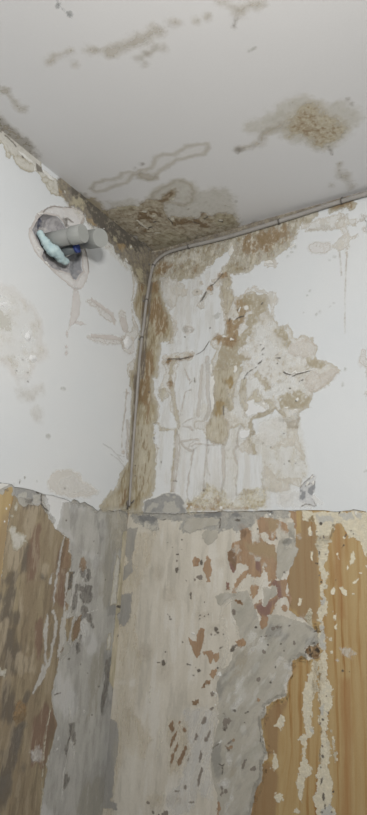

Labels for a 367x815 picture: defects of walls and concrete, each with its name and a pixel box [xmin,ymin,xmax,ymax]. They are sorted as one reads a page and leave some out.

spalling [0,130,89,290]
leakage [58,178,364,515]
leakage [289,104,345,147]
flaking render [13,474,367,815]